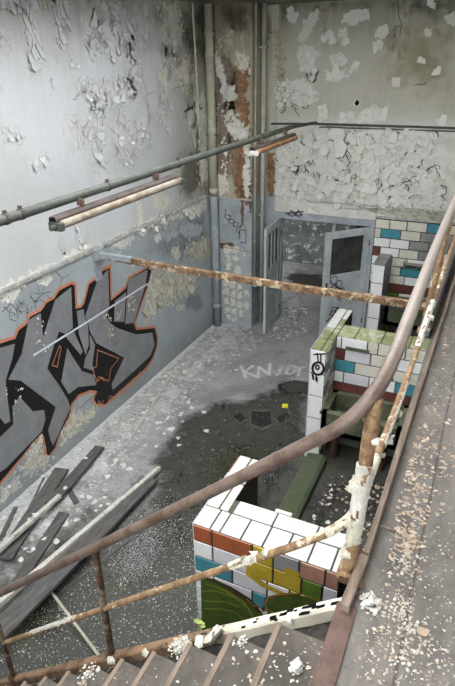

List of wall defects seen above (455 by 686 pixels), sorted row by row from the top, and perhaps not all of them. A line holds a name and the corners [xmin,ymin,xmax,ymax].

peeling [0,0,187,178]
peeling [103,27,253,344]
rust [224,64,252,225]
peeling [272,6,451,221]
peeling [443,11,455,26]
crack [2,272,70,338]
leakage [171,500,208,546]
leakage [153,381,308,508]